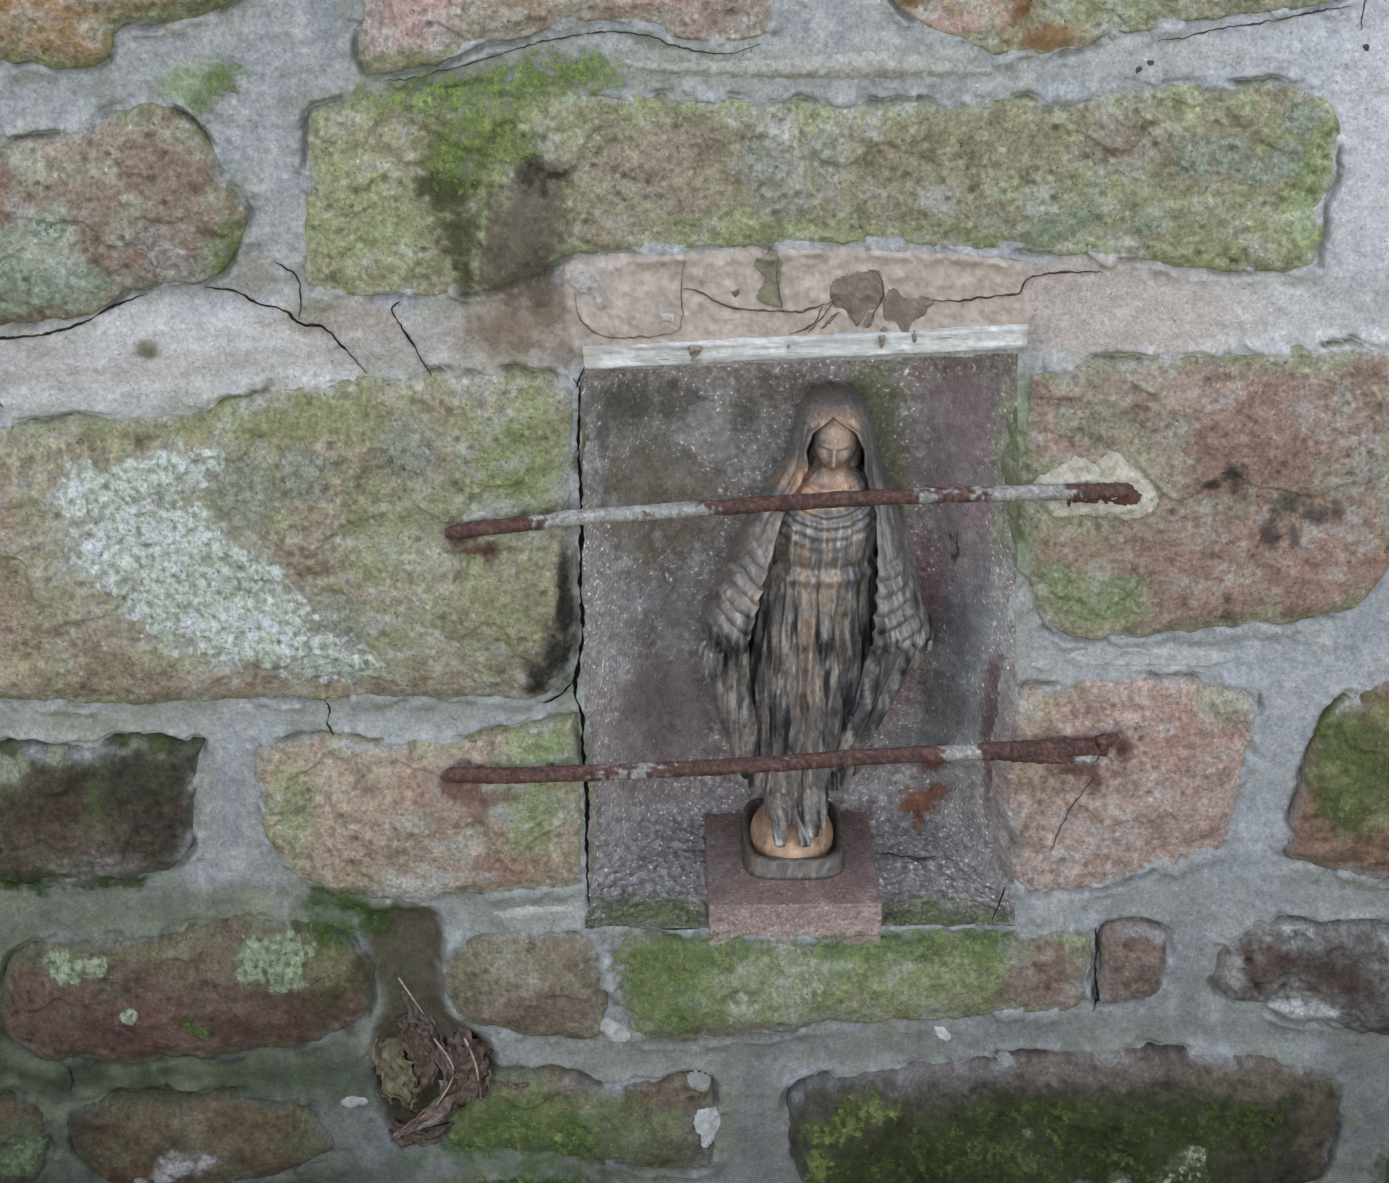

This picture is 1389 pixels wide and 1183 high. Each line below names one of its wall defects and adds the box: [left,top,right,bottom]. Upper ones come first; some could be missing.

crack [1158,0,1366,41]
crack [0,293,148,340]
crack [204,262,367,374]
leakage [414,156,568,352]
peeling [688,345,702,365]
crack [575,257,834,339]
flaking render [821,269,934,349]
crack [926,270,1103,303]
leakage [527,551,575,694]
crack [544,366,590,905]
rust [901,743,947,828]
rust [1117,740,1130,761]